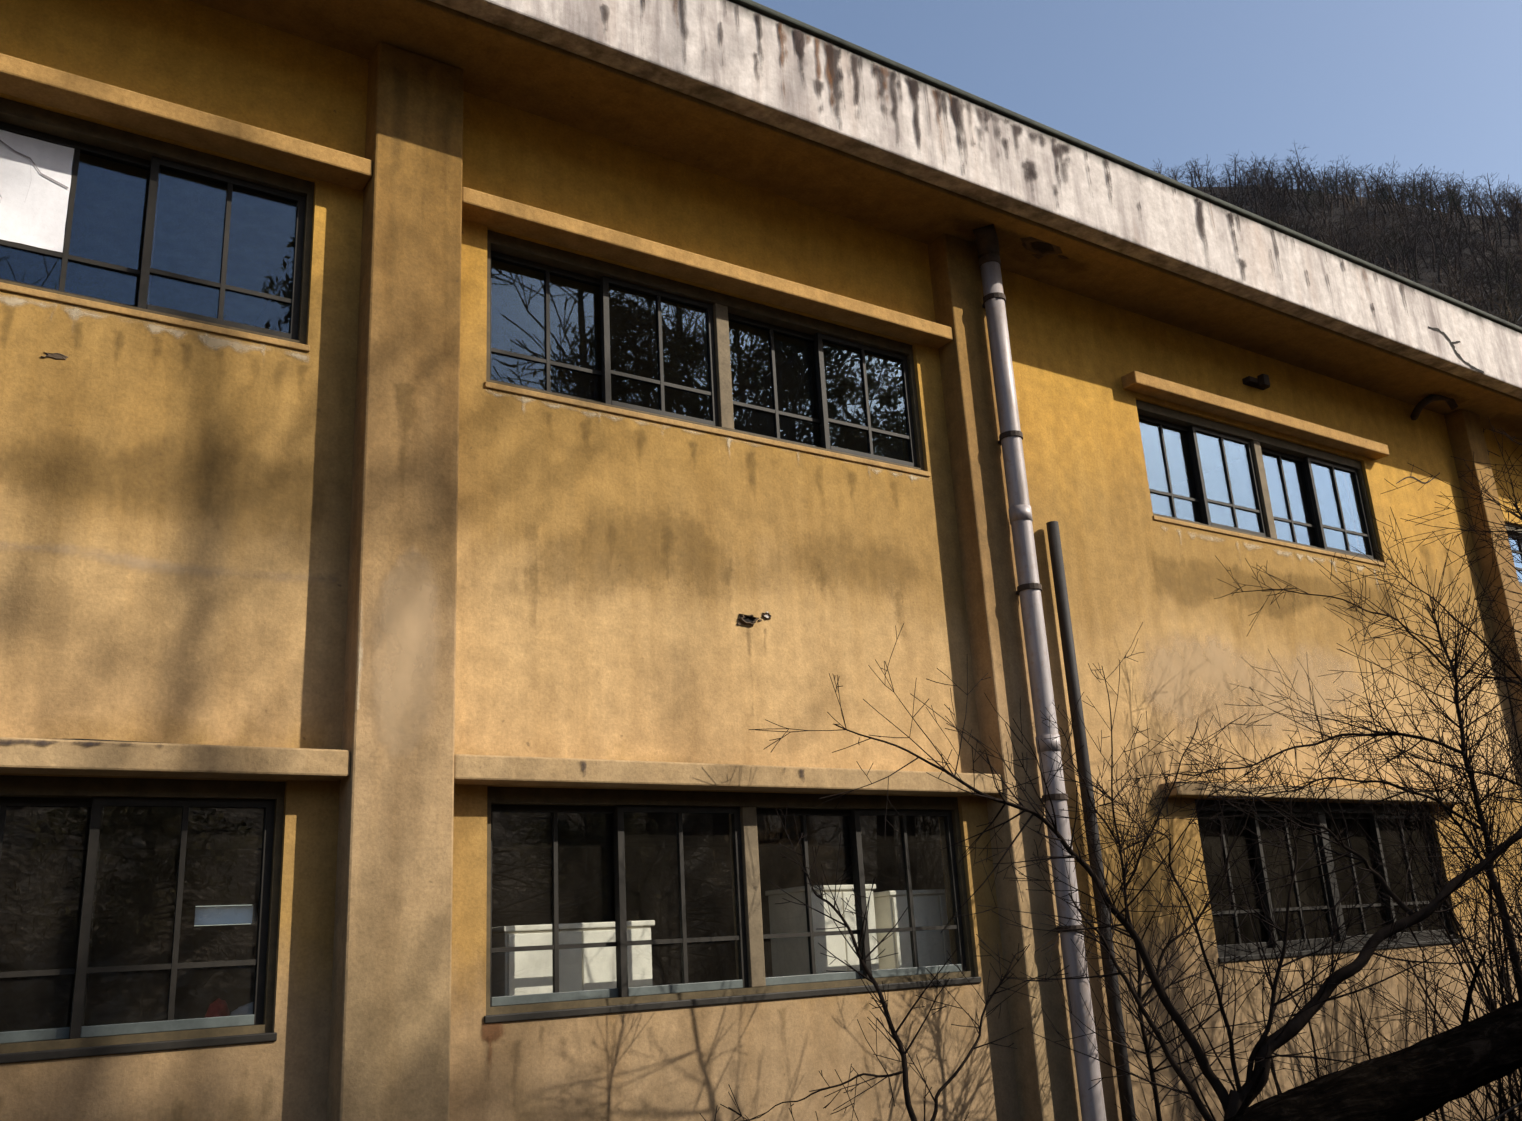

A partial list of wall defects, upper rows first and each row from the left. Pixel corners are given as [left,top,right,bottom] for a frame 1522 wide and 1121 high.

leakage [675,0,687,37]
leakage [720,1,1112,205]
leakage [1196,198,1207,247]
leakage [1227,212,1246,279]
leakage [1,297,26,305]
leakage [201,336,258,350]